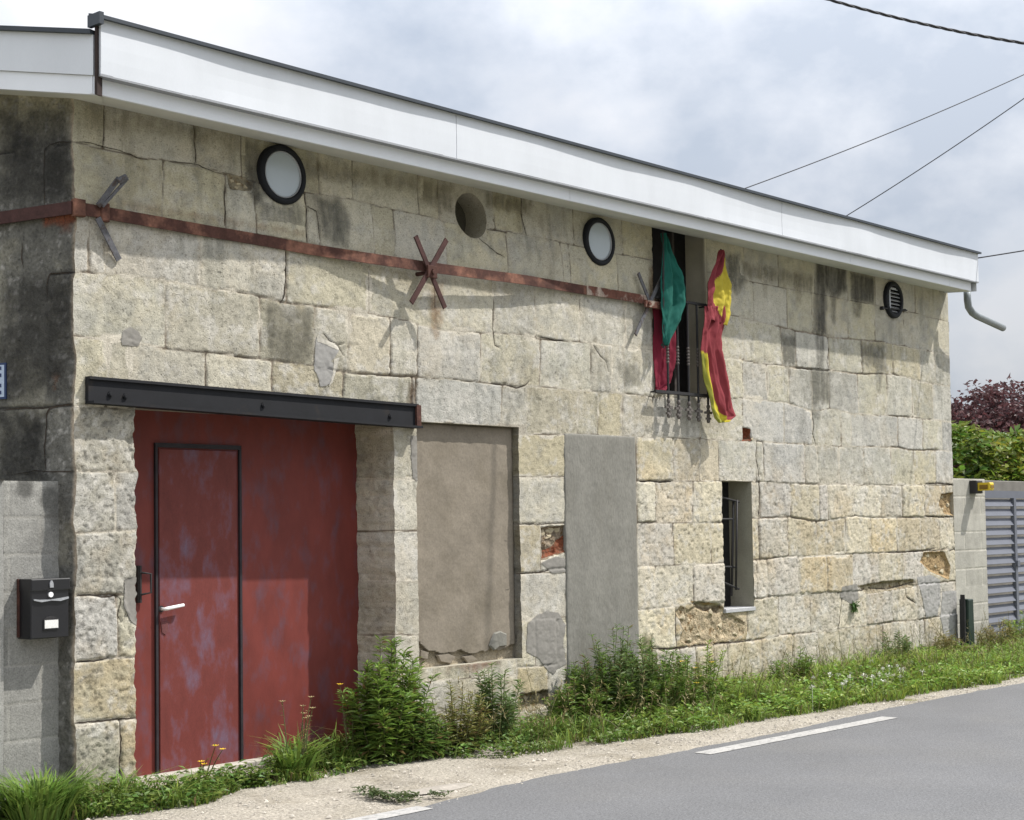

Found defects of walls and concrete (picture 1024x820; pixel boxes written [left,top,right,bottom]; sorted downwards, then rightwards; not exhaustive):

damp [816,264,874,332]
spalling [939,492,953,516]
spalling [540,525,565,560]
spalling [920,551,950,580]
spalling [858,579,914,594]
spalling [675,601,746,647]